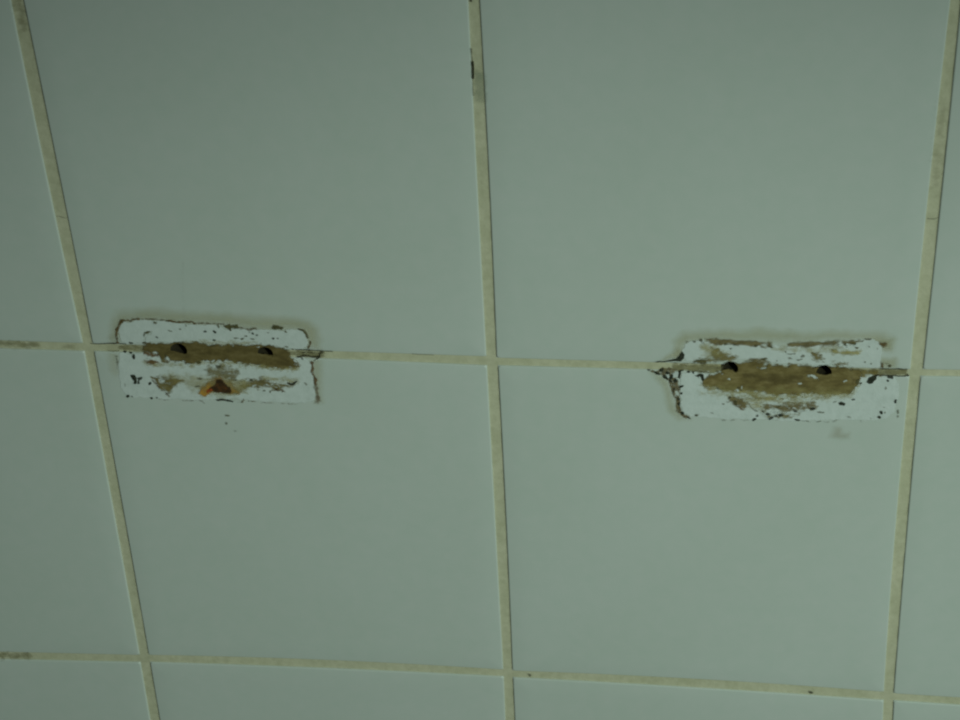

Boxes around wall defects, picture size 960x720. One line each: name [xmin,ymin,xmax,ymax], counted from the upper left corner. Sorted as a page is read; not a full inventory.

peeling [118,319,316,403]
corrosion [200,377,240,396]
peeling [651,339,899,421]